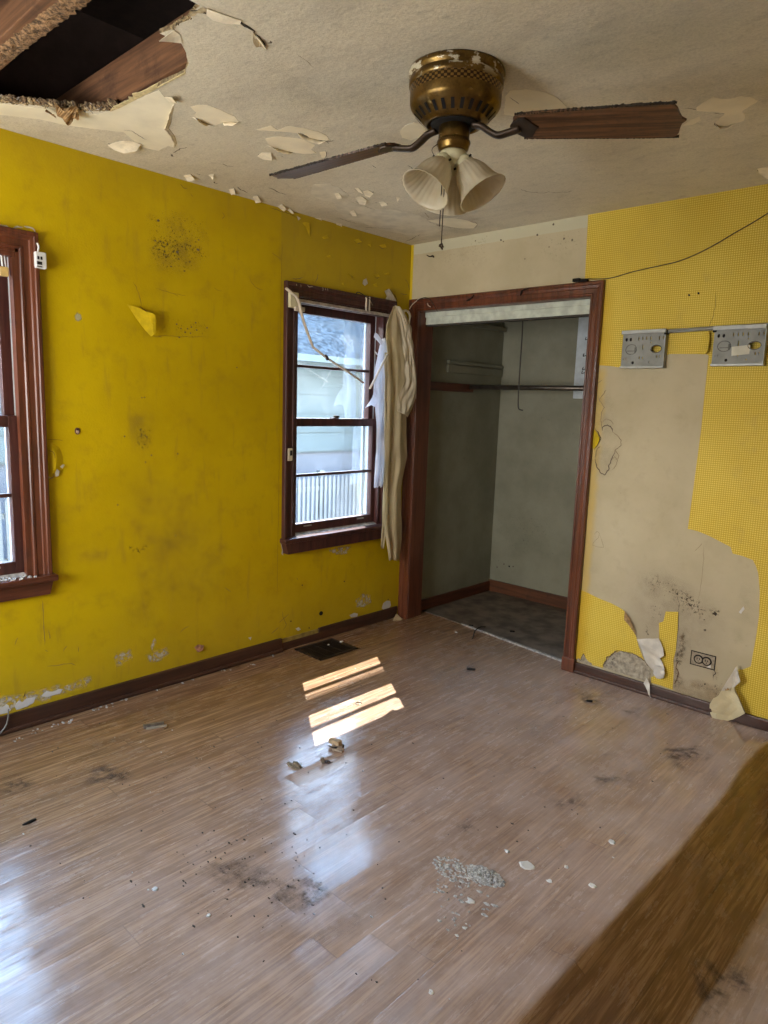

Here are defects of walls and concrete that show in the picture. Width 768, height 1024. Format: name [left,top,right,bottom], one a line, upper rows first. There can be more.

peeling [0,72,186,155]
peeling [191,105,240,126]
peeling [683,96,758,129]
peeling [257,126,331,161]
peeling [350,188,401,216]
peeling [128,284,161,337]
flaking render [576,650,651,681]
flaking render [0,679,90,714]